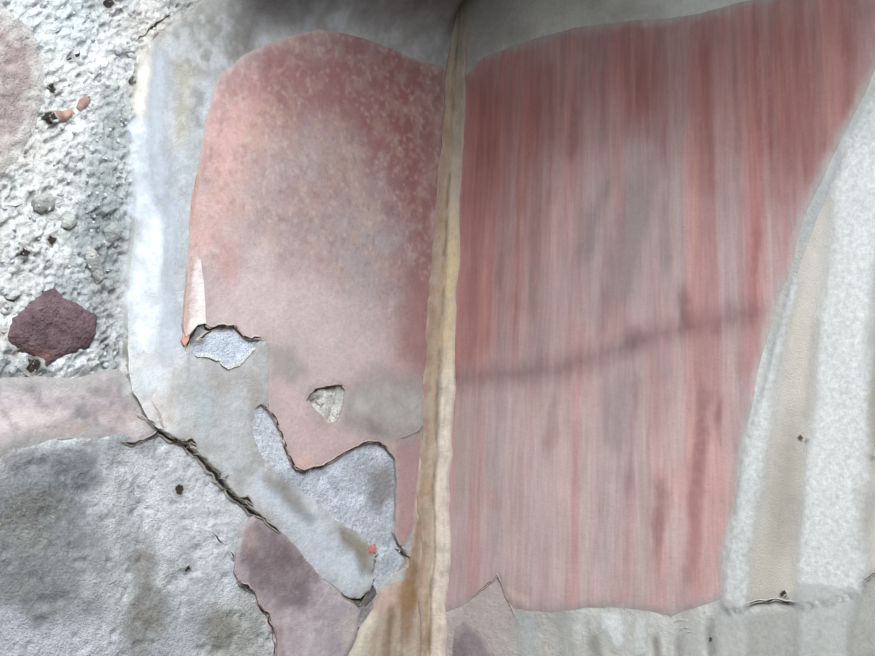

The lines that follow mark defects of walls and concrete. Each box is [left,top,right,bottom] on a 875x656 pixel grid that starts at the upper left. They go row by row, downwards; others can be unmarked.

peeling [190,172,199,226]
spalling [181,254,258,370]
spalling [308,386,343,423]
crack [121,401,283,536]
spalling [252,405,405,627]
crack [861,572,875,593]